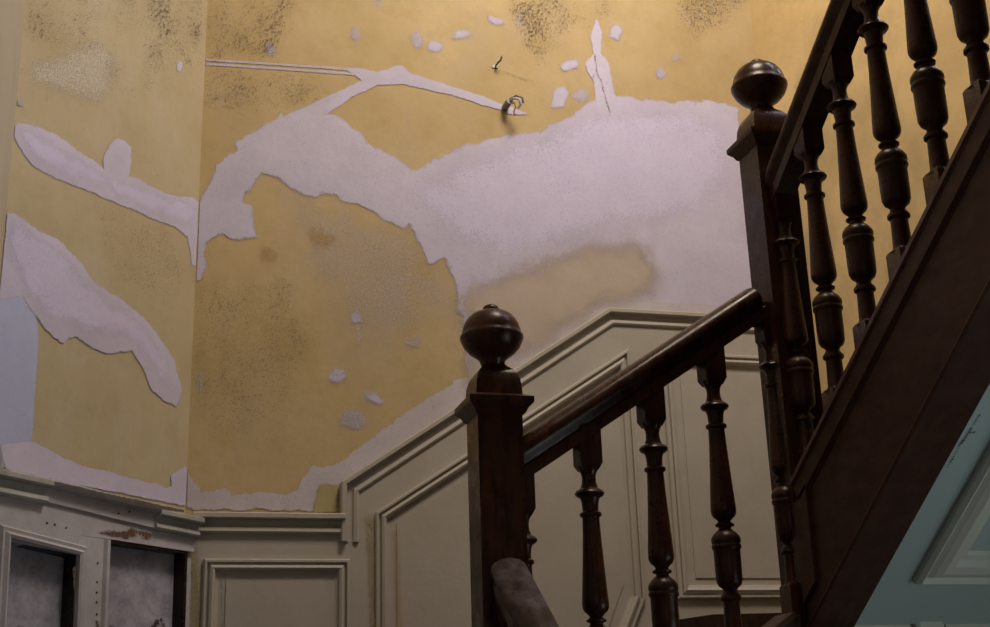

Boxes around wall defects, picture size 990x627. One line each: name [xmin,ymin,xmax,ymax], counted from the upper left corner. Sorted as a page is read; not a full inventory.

water stain [26,0,324,113]
water stain [509,0,617,65]
peeling [447,229,670,399]
corrosion [98,527,151,540]